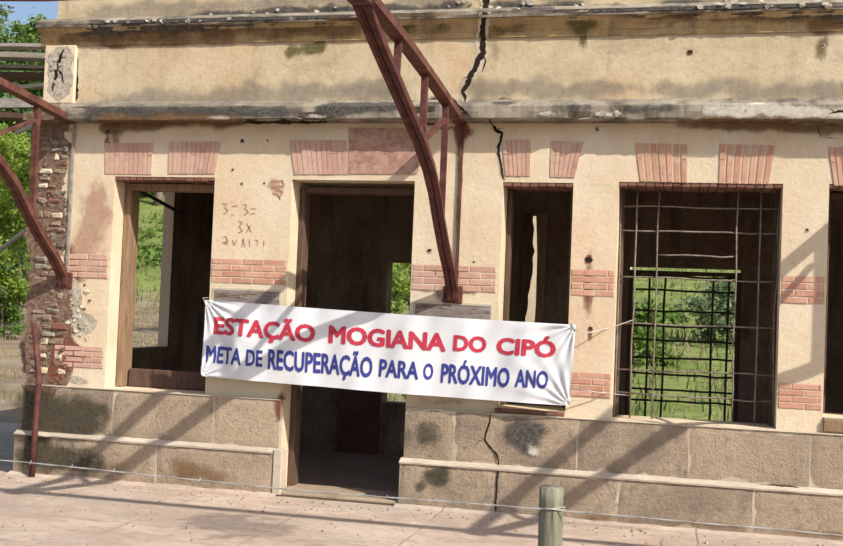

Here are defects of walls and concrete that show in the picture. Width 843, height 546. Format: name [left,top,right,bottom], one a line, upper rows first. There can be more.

leakage [62,0,360,58]
leakage [385,0,467,31]
leakage [509,0,843,55]
spalling [46,46,75,108]
crack [427,0,505,179]
spalling [23,111,109,261]
spalling [19,224,97,395]
leakage [14,390,118,475]
leakage [175,461,219,481]
leakage [418,466,449,490]
crack [475,411,499,512]
leakage [505,418,547,456]